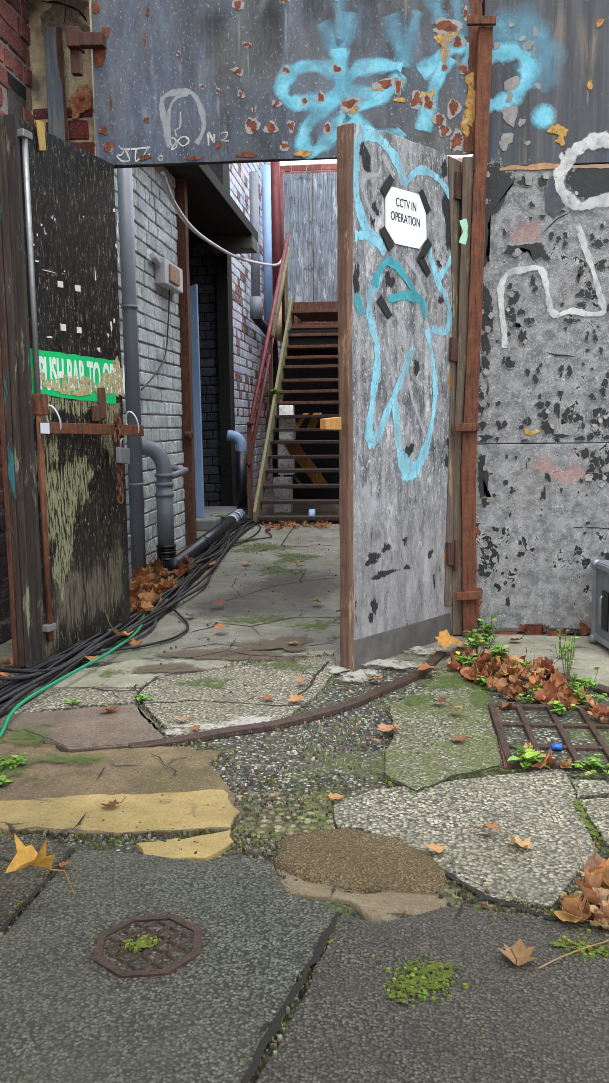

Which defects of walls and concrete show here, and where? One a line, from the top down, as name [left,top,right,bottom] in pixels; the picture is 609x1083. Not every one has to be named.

rust [232,0,245,21]
peeling [509,22,539,58]
rust [301,90,325,106]
rust [340,97,361,114]
rust [371,0,483,154]
rust [245,108,312,157]
peeling [484,76,609,268]
peeling [476,223,609,508]
peeling [539,472,563,516]
peeling [477,542,528,607]